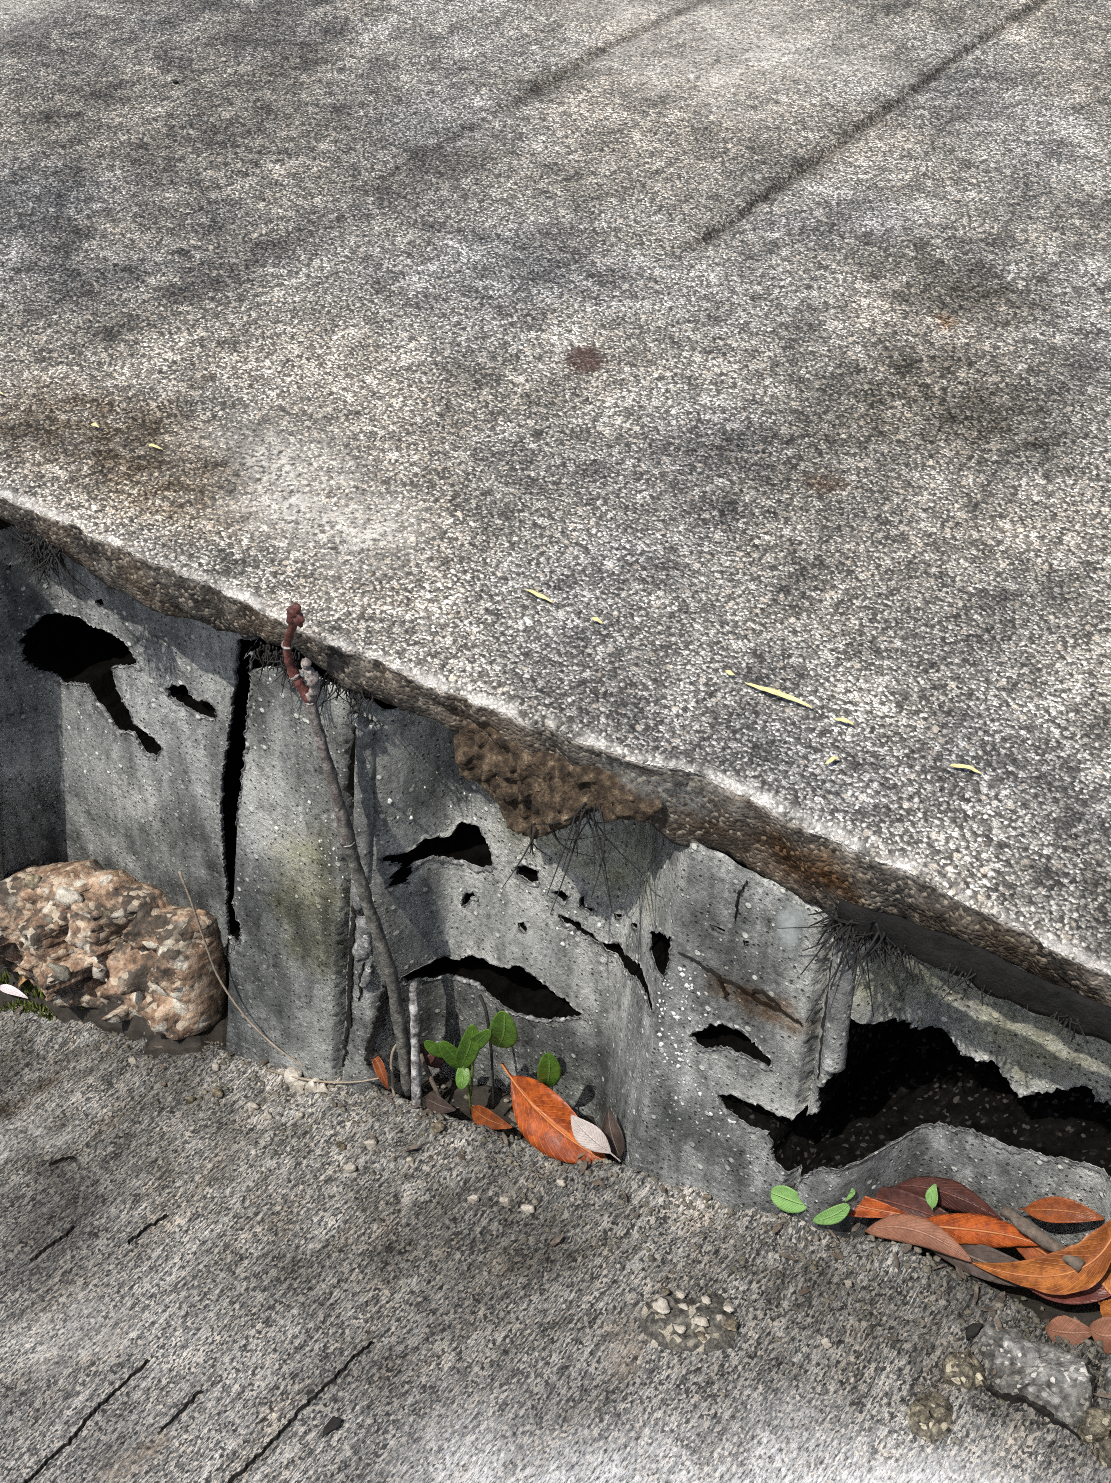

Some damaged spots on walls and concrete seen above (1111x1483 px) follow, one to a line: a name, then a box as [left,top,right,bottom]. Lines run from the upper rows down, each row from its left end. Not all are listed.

spalling [16,611,163,761]
spalling [163,637,261,958]
spalling [378,821,672,1025]
spalling [688,1020,773,1072]
spalling [713,1073,1111,1183]
spalling [850,1016,1111,1105]
crack [24,1359,150,1483]
crack [227,1340,373,1483]